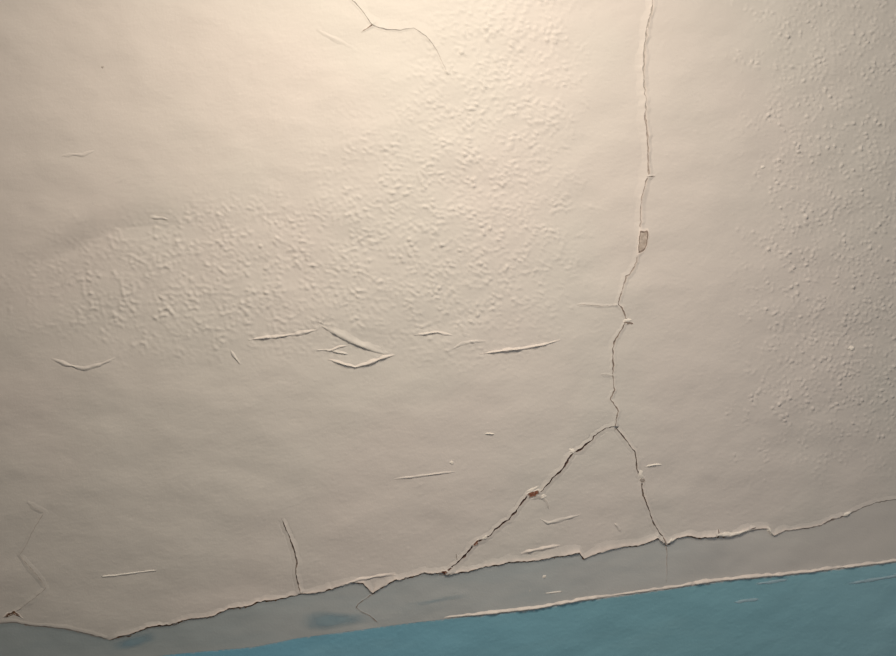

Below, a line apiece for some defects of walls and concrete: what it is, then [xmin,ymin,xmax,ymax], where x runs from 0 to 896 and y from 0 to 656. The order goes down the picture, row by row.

crack [349,0,454,75]
crack [577,0,658,426]
peeling [0,500,896,656]
crack [109,421,896,640]